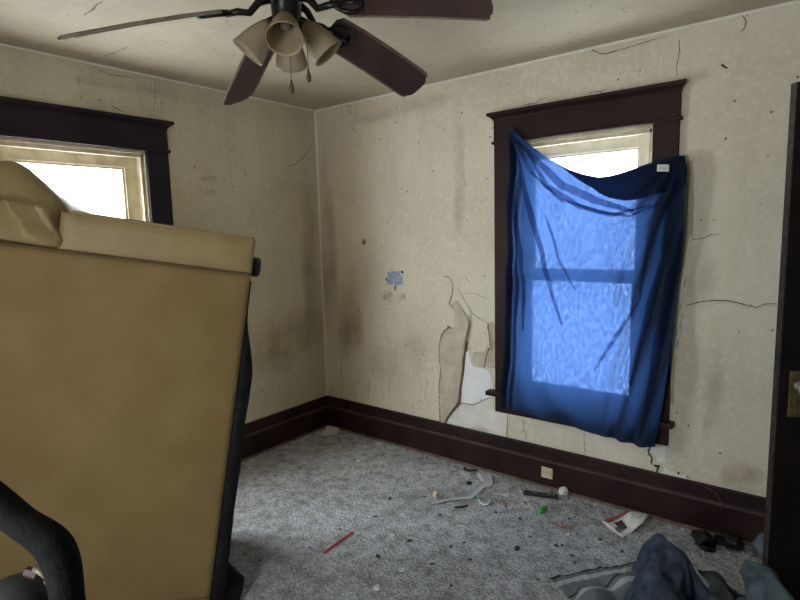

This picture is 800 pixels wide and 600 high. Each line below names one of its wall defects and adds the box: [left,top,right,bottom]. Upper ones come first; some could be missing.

crack [590,36,680,74]
crack [686,300,777,310]
flaking render [447,323,507,437]
crack [647,447,664,473]